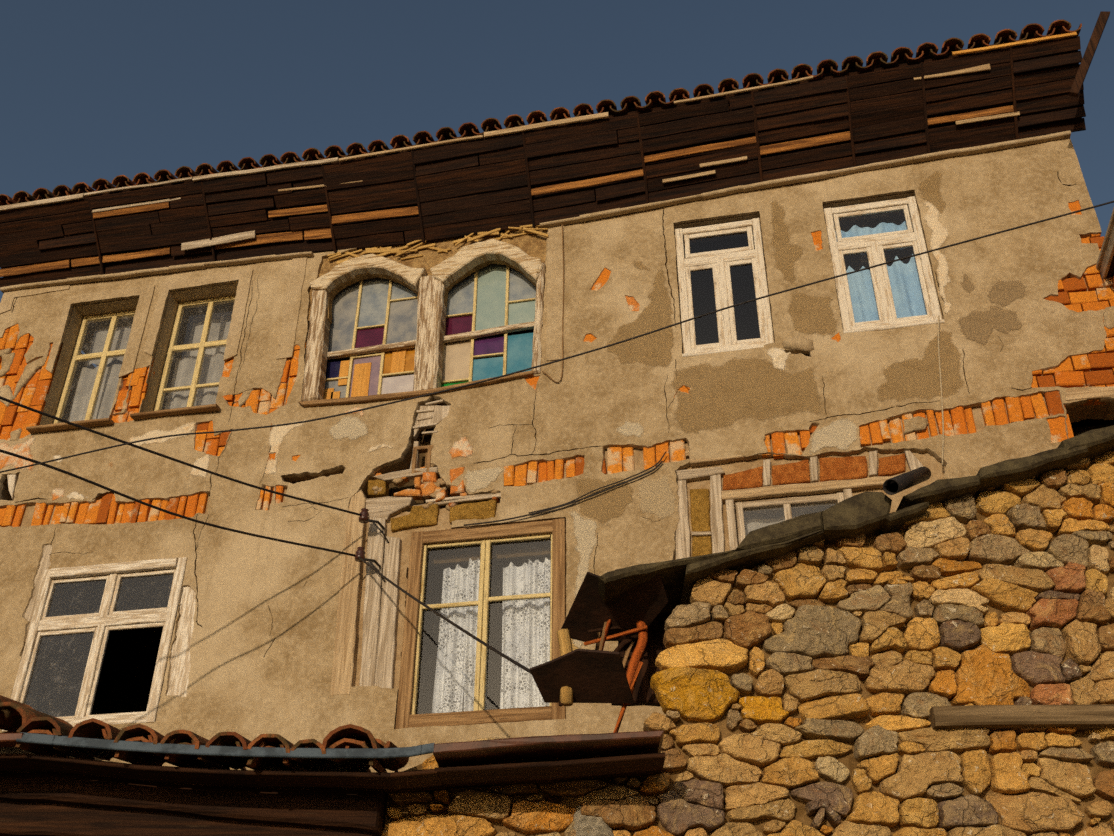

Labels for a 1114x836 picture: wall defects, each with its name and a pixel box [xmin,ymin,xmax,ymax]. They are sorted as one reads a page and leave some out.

spalling [0,323,210,527]
spalling [129,420,232,477]
spalling [222,341,307,511]
peeling [329,171,1114,597]
spalling [20,543,52,656]
spalling [165,585,196,697]